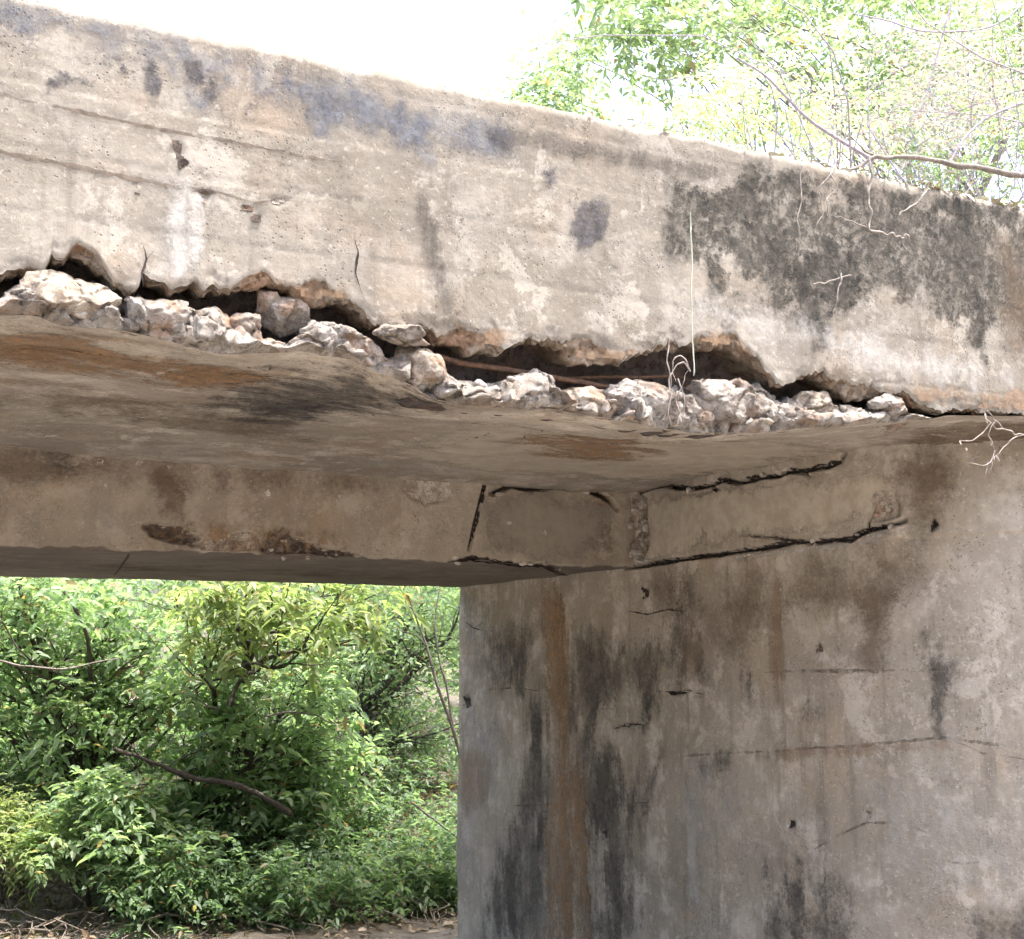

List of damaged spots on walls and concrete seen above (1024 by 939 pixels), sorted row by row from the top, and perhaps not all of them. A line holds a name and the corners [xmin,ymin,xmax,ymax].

leakage [662,163,1024,384]
spalling [0,242,1006,439]
rust [577,349,636,360]
spalling [142,524,354,561]
crack [452,485,568,576]
crack [581,492,612,508]
crack [636,457,846,499]
crack [631,520,907,569]
leakage [633,589,704,733]
leakage [482,625,549,939]
leakage [567,628,658,939]
leakage [766,859,855,939]